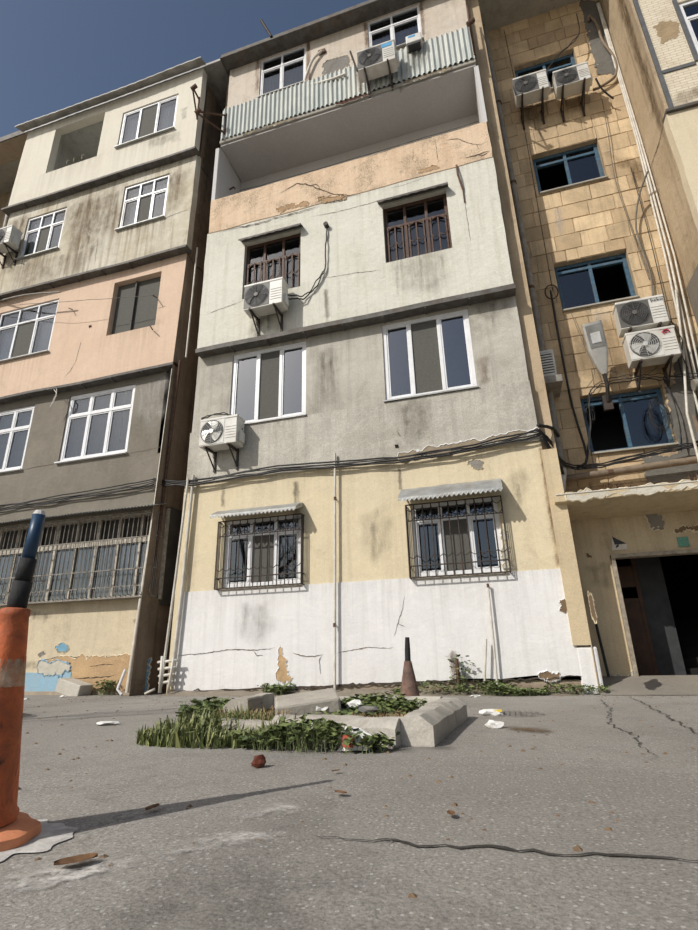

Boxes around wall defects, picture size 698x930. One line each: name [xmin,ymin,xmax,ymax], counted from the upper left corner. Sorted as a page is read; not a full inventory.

peeling [653,20,680,44]
crack [366,123,489,158]
crack [222,183,376,231]
spalling [276,194,347,213]
peeling [397,427,539,471]
peeling [564,480,698,503]
spalling [644,514,698,535]
spalling [37,642,131,691]
peeling [275,646,293,684]
crack [600,697,695,759]
crack [313,835,698,861]